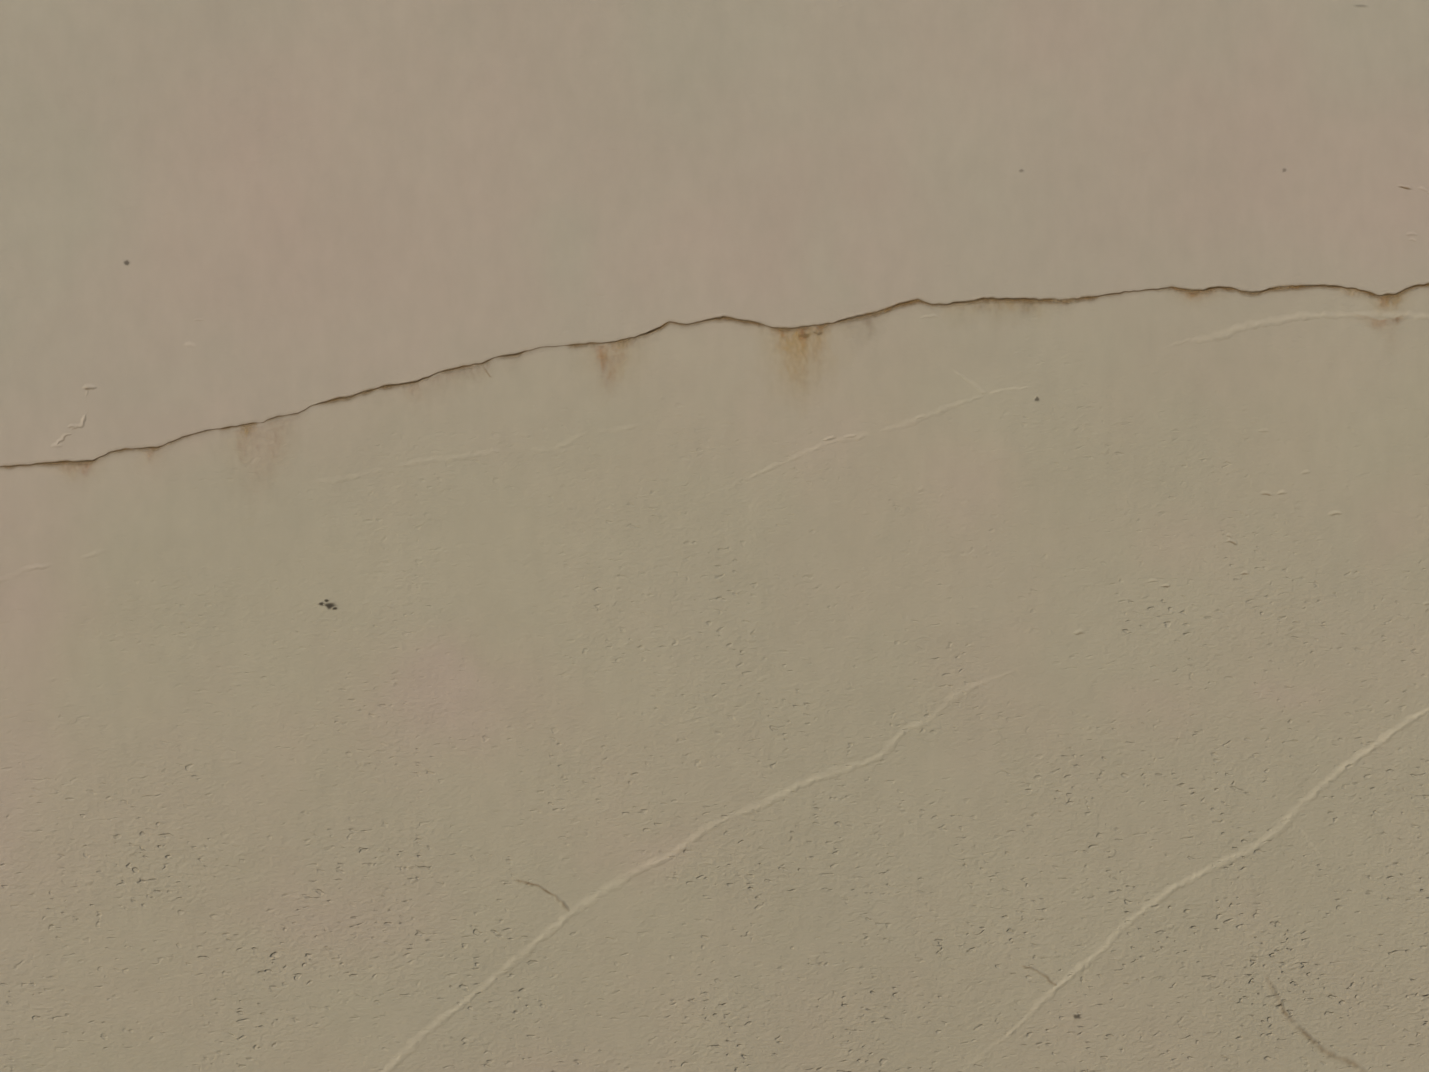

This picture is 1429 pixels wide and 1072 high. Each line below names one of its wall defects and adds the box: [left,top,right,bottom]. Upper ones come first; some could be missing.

crack [0,281,1429,470]
crack [381,661,1035,1072]
crack [959,707,1429,1072]